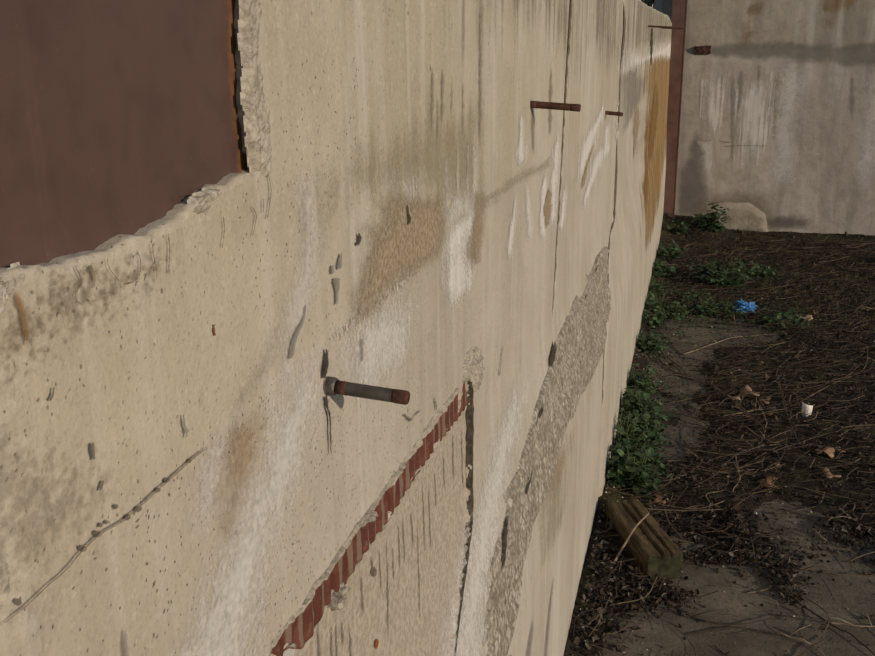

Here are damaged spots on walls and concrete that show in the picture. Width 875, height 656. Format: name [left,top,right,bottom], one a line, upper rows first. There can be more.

corrosion [16,294,28,342]
crack [6,447,208,622]
spalling [186,184,222,214]
spalling [237,0,272,178]
peeling [270,346,485,656]
water stain [348,24,485,386]
crack [455,379,474,656]
water stain [508,140,567,257]
spalling [482,246,611,656]
crack [552,0,572,313]
crack [608,5,626,276]
water stain [577,0,671,205]